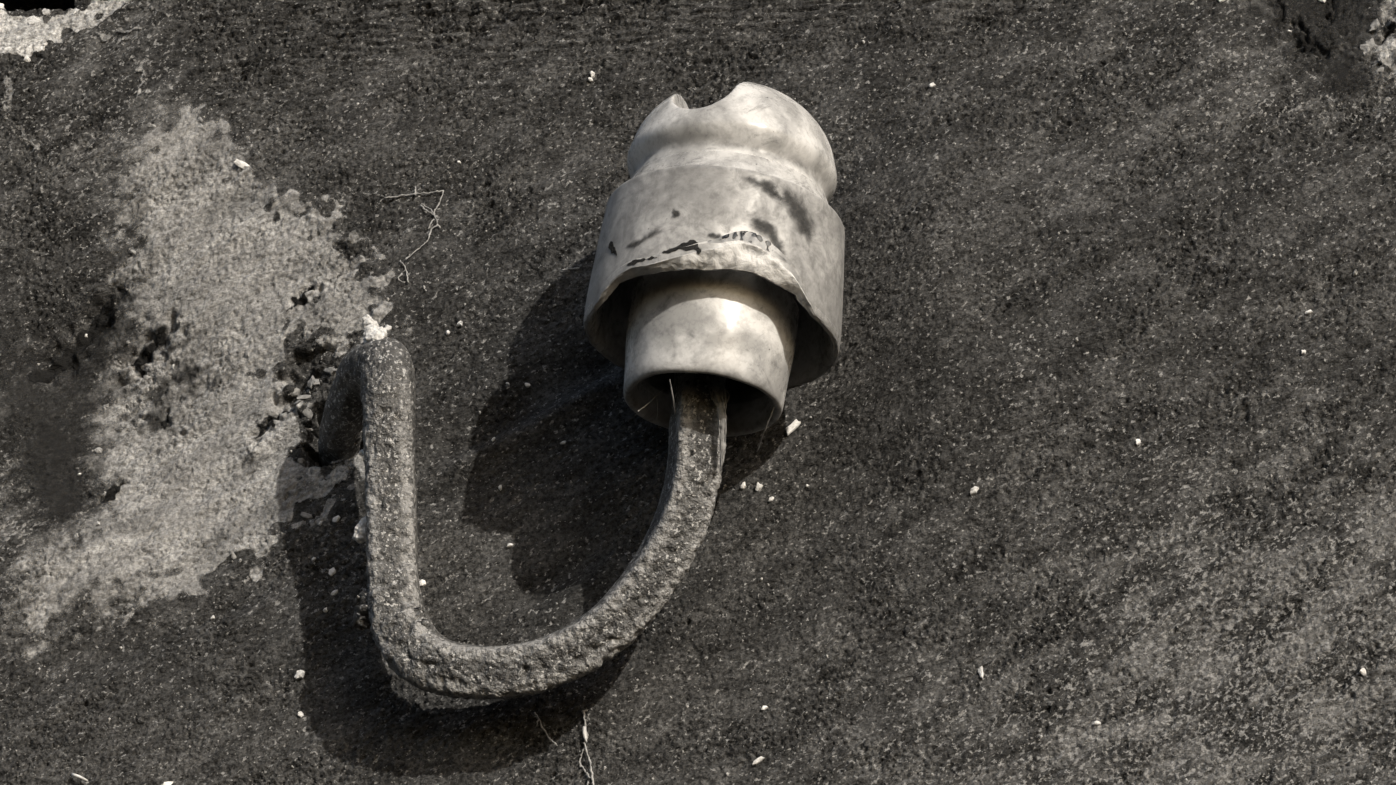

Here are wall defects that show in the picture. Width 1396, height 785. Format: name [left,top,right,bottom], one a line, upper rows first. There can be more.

spalling [0,0,131,63]
spalling [1360,0,1396,91]
spalling [1,104,412,658]